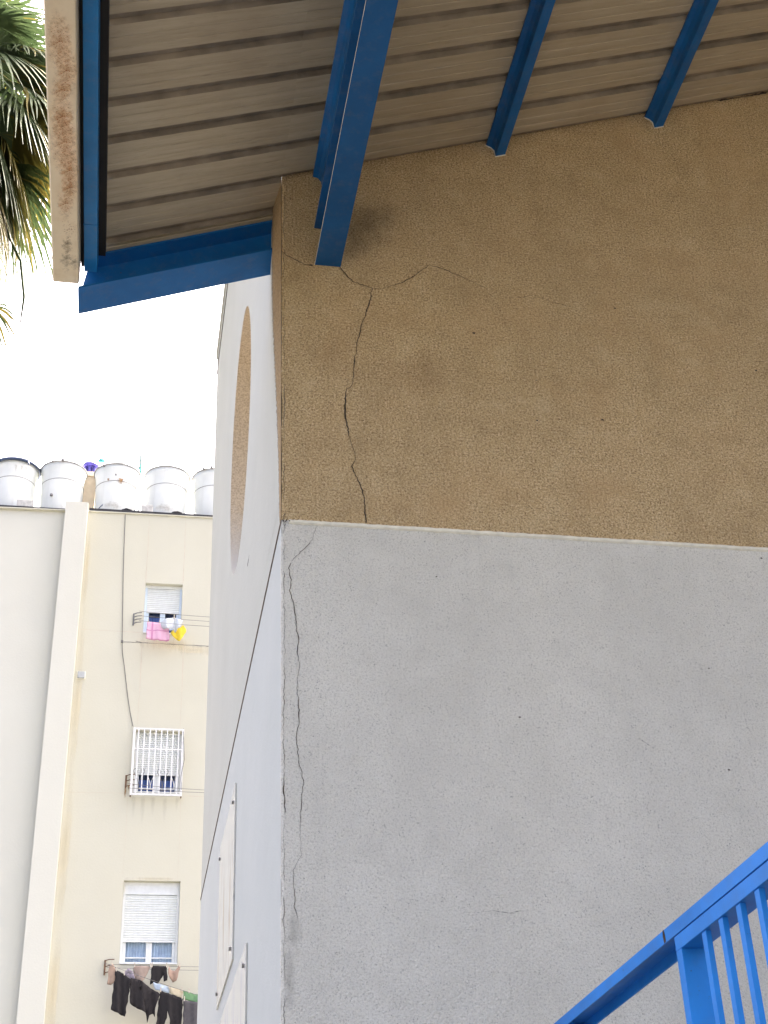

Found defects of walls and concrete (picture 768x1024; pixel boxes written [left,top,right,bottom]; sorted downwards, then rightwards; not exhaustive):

crack [340,265,483,523]
crack [283,454,314,968]